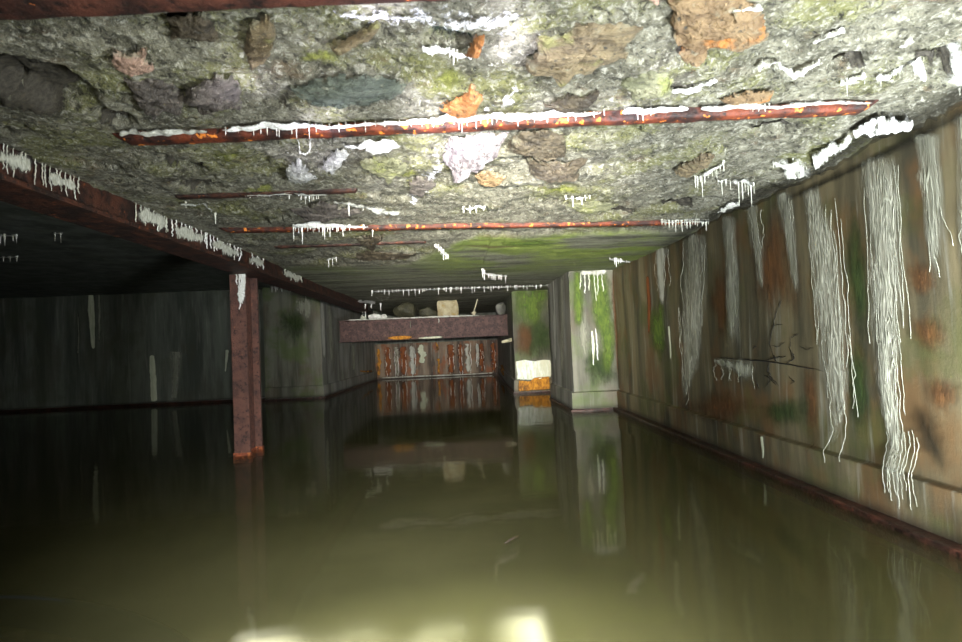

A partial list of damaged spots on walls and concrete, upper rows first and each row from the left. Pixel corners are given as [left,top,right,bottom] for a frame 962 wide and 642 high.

leakage [224,84,605,155]
leakage [622,106,688,119]
leakage [0,143,80,200]
leakage [655,42,962,510]
leakage [352,269,565,380]
leakage [580,258,630,365]
rust [360,336,411,376]
rust [436,343,463,375]
rust [479,343,504,376]